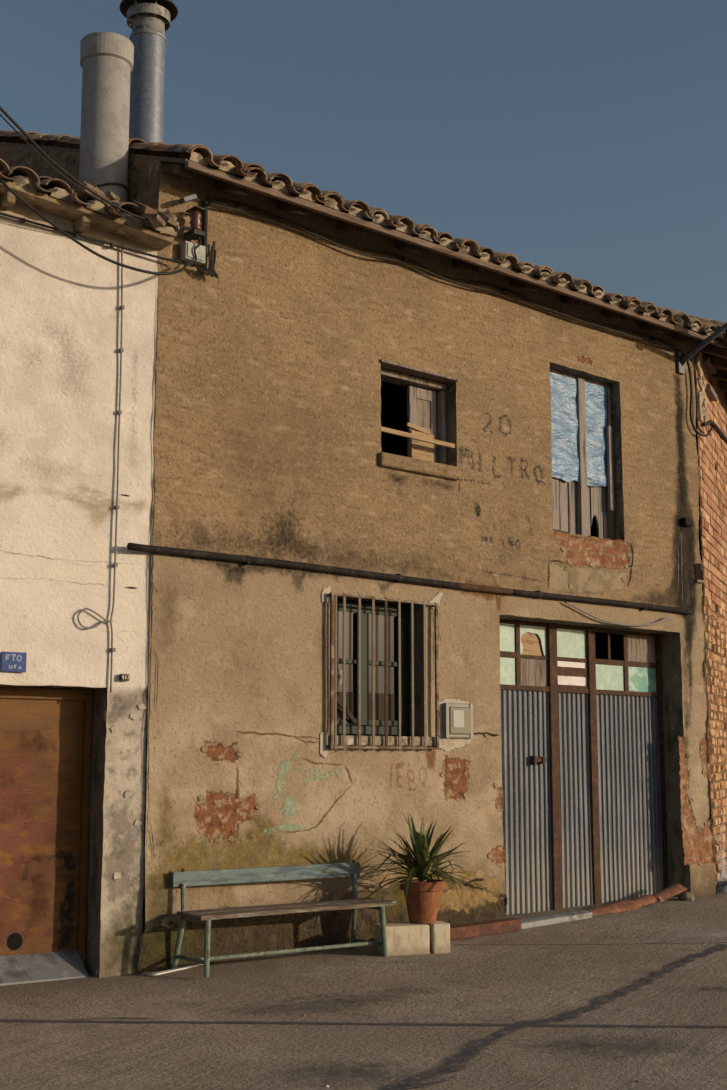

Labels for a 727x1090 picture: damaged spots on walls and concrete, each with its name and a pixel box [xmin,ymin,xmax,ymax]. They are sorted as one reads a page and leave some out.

spalling [548,531,633,594]
water stain [654,376,696,686]
spalling [200,741,244,764]
spalling [195,790,262,847]
spalling [439,699,472,800]
spalling [678,723,717,866]
crack [0,940,727,1090]